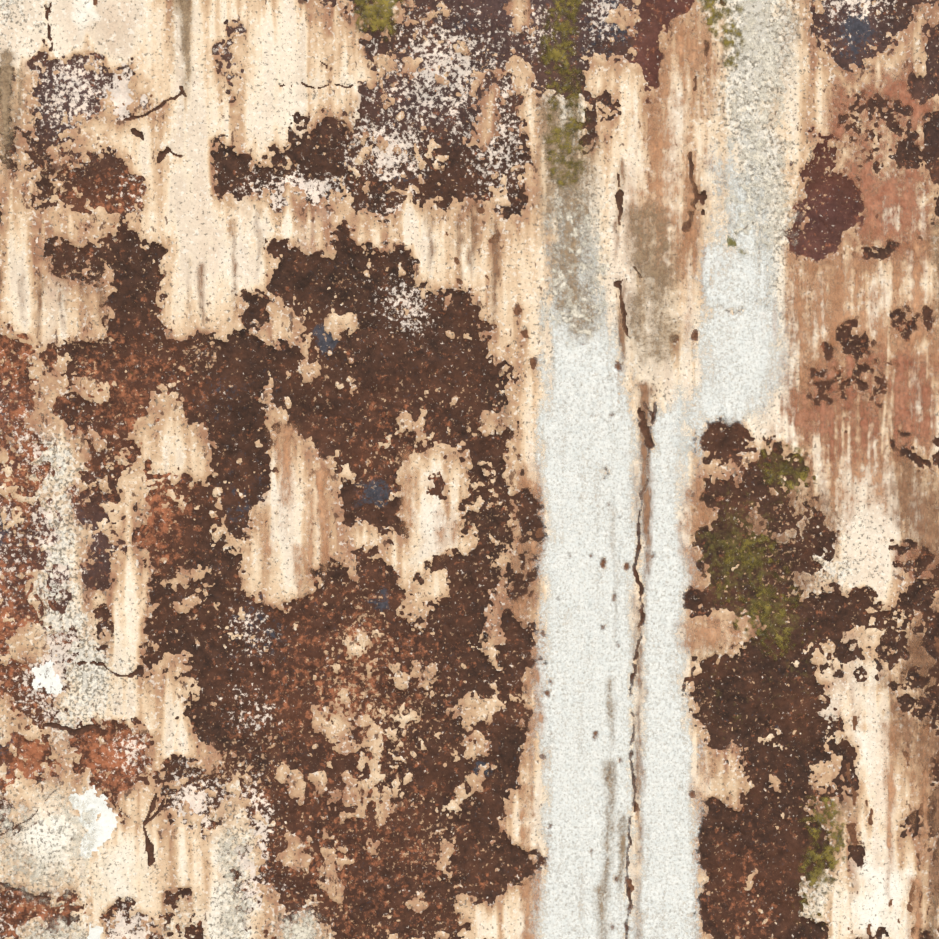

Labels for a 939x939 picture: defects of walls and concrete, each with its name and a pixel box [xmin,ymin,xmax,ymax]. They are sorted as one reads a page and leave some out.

crack [44,2,53,52]
crack [123,86,187,121]
rust [810,0,939,73]
peeling [43,206,80,243]
rust [0,0,717,939]
rust [680,23,939,939]
crack [624,398,657,939]
peeling [69,785,179,939]